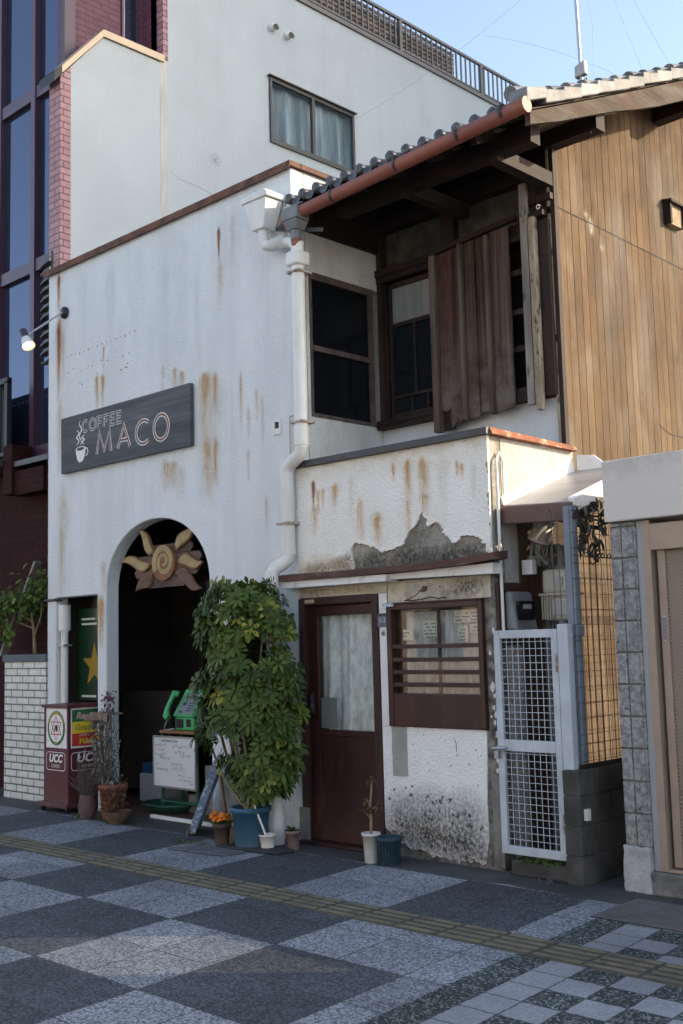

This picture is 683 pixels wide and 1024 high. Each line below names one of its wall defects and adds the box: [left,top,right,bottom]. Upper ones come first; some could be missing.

rust [202,374,216,402]
rust [392,460,425,488]
flaking render [349,510,489,569]